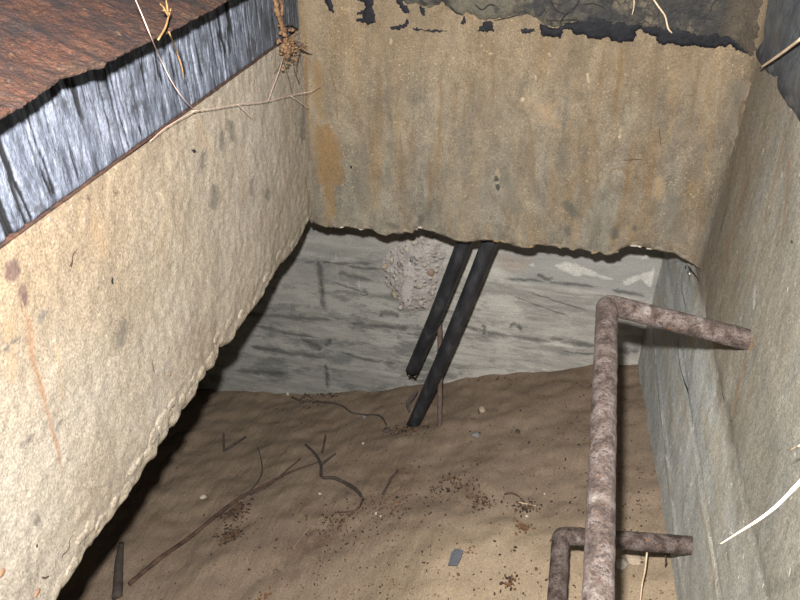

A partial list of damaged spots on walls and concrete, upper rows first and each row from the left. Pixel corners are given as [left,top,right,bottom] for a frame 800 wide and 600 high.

peeling [356,0,376,25]
peeling [390,0,763,56]
corrosion [303,44,352,223]
leakage [719,68,752,146]
corrosion [0,251,67,492]